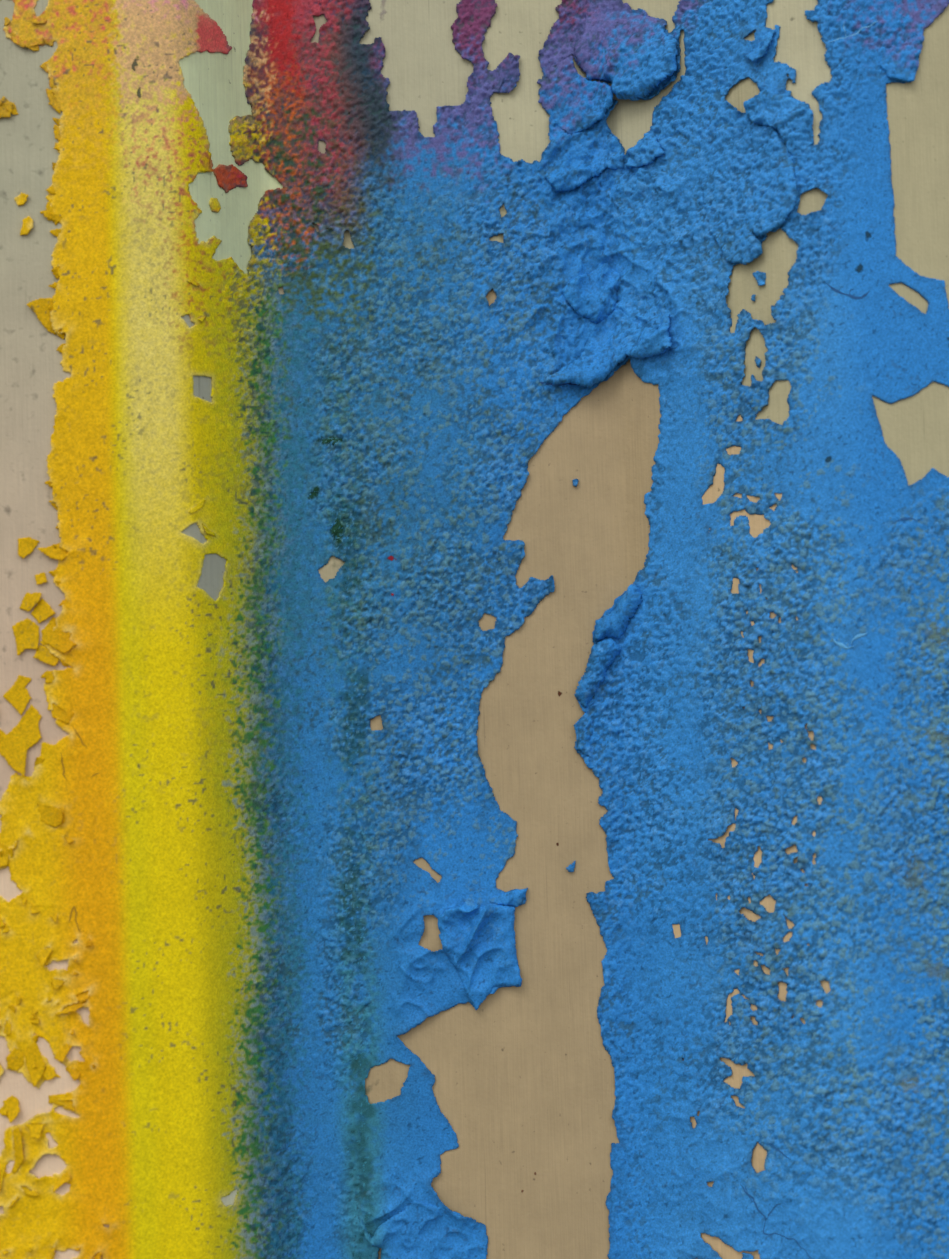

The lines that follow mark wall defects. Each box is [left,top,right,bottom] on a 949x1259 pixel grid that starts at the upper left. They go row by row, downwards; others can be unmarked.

peeling [179,0,283,274]
peeling [360,0,562,163]
peeling [571,0,686,154]
peeling [744,0,832,145]
peeling [886,4,949,309]
peeling [726,228,798,425]
peeling [0,0,77,922]
peeling [702,446,782,538]
peeling [872,382,949,485]
peeling [365,359,661,1259]
peeling [715,893,794,1025]
peeling [0,938,96,1214]